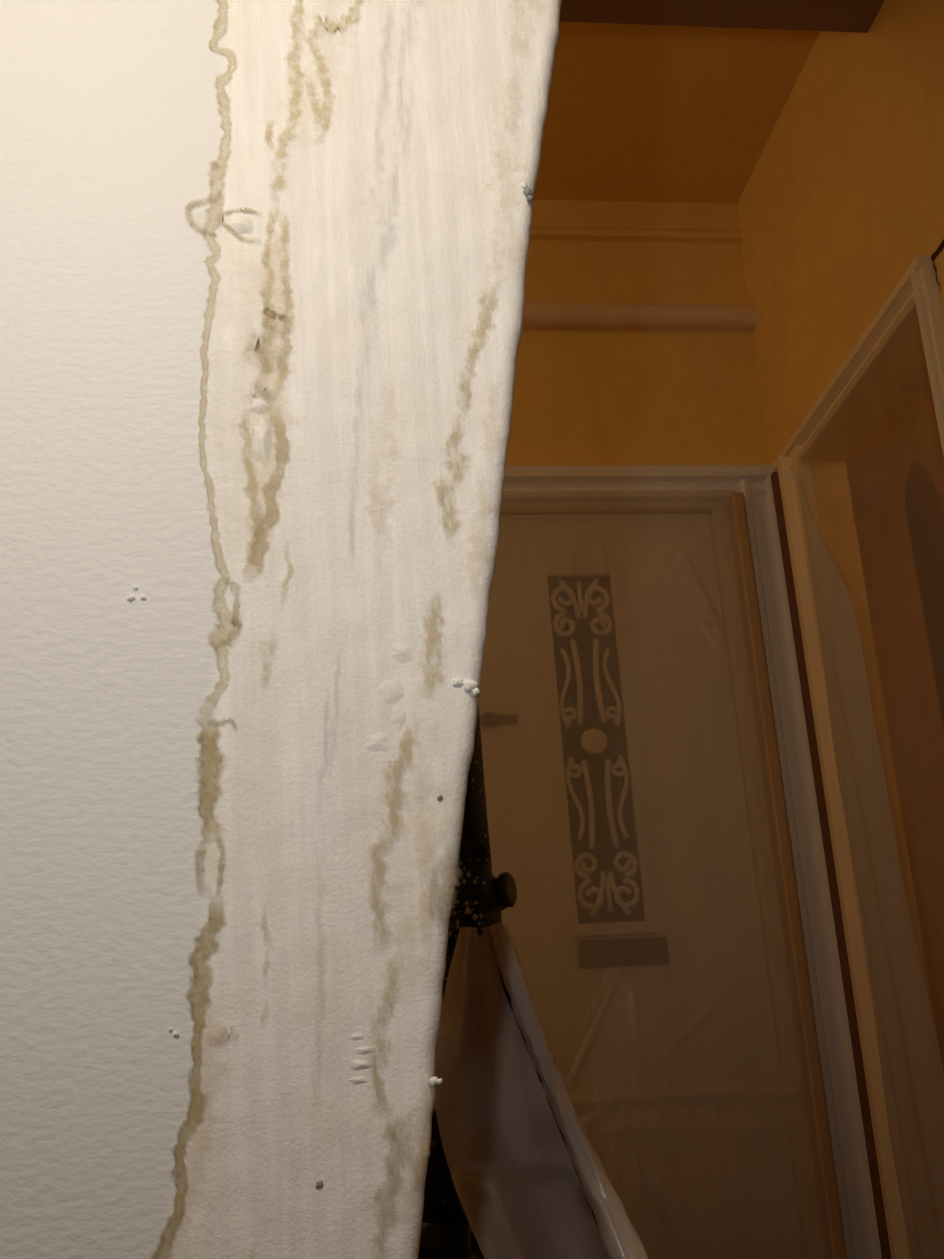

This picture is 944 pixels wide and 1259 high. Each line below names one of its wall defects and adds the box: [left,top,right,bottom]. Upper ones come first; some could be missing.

damp [186,0,254,239]
damp [199,251,240,703]
damp [245,424,288,565]
damp [198,719,235,825]
damp [153,912,223,1259]